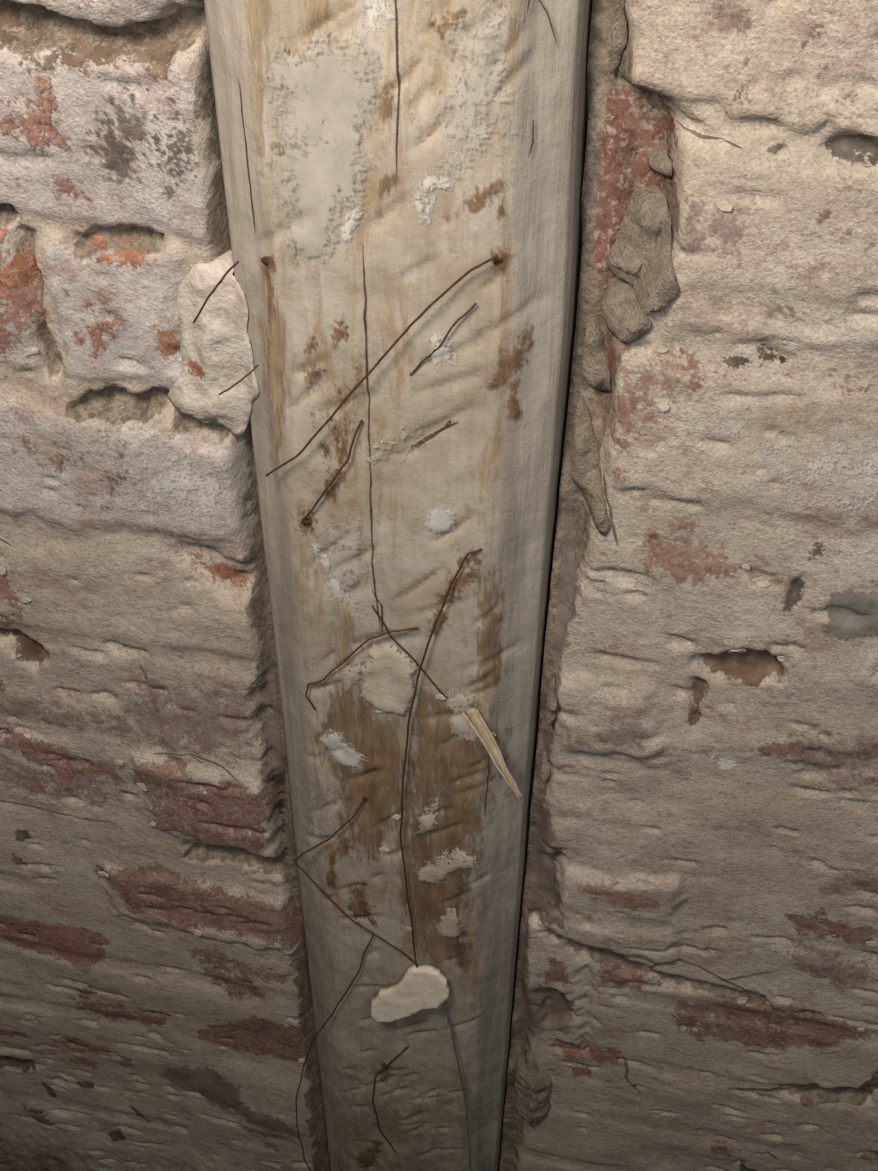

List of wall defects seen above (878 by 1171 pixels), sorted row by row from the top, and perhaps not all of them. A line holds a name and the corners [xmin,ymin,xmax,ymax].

crack [363,262,383,630]
crack [411,420,458,448]
spalling [822,580,878,641]
spalling [687,648,786,726]
crack [482,754,490,809]
rust [326,836,377,926]
peeling [315,684,507,1023]
crack [728,1069,878,1091]